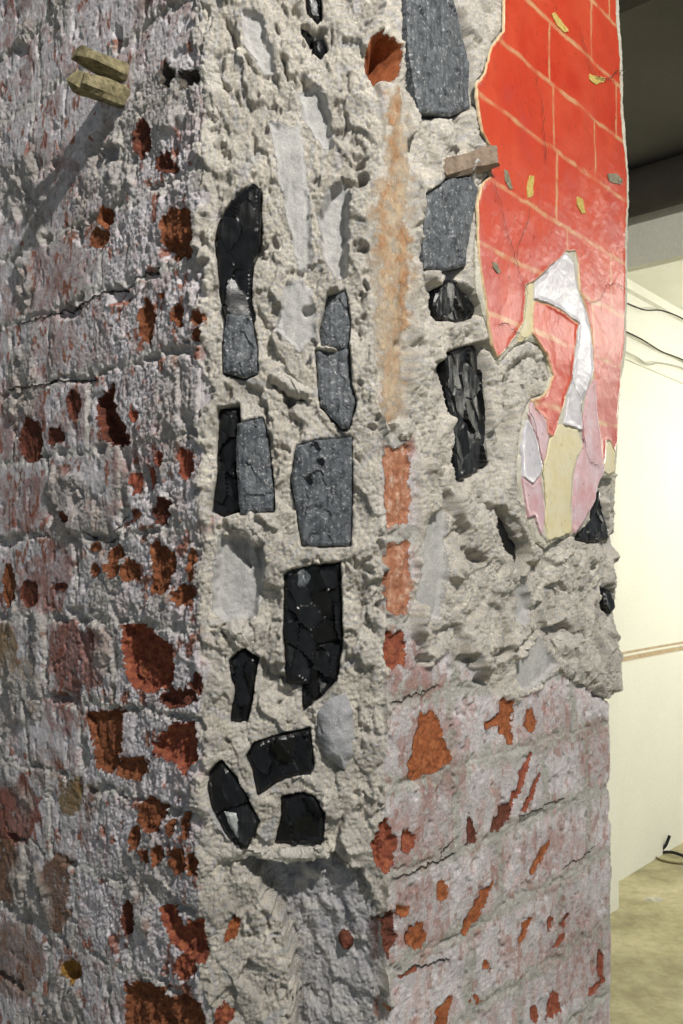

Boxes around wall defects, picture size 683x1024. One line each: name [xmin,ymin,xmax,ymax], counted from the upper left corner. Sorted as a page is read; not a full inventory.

spalling [364,30,404,86]
corrosion [368,87,416,423]
crack [16,267,160,325]
spalling [95,382,138,447]
spalling [121,621,203,709]
crack [391,684,440,703]
spalling [407,710,452,781]
spalling [484,697,537,745]
spalling [465,752,541,846]
crack [520,798,564,817]
spalling [370,817,416,874]
crack [392,840,456,879]